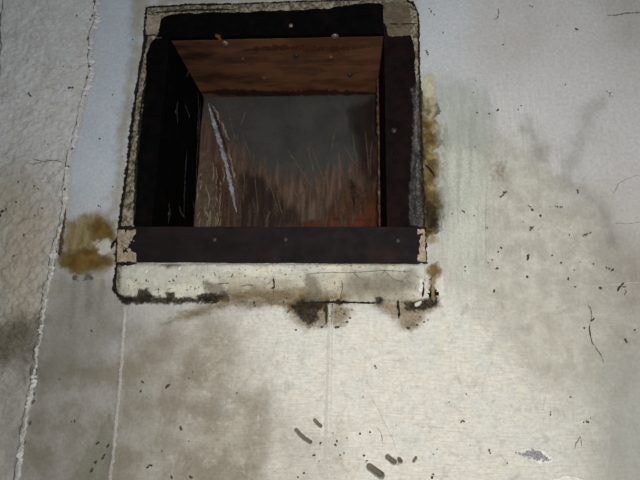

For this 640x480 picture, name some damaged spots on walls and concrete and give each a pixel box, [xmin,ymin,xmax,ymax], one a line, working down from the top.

peeling [117,229,202,290]
water stain [119,276,352,331]
water stain [350,274,439,329]
corrosion [427,265,441,301]
crack [588,305,604,362]
spalling [515,448,554,464]